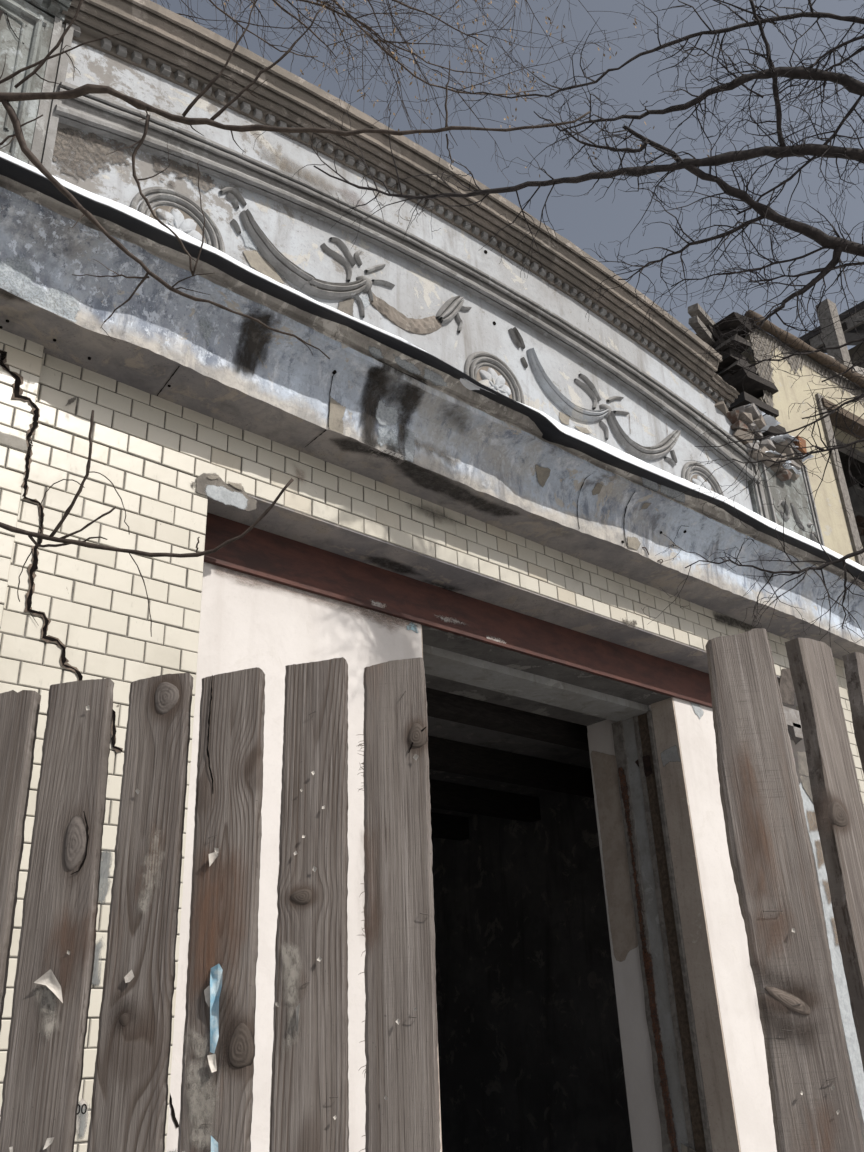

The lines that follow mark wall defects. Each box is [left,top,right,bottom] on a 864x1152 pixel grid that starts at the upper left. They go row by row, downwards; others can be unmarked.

leakage [235,313,271,374]
leakage [333,360,518,516]
spalling [714,401,815,482]
crack [0,350,83,681]
spalling [192,473,257,512]
crack [111,710,123,753]
rust [618,767,678,1152]